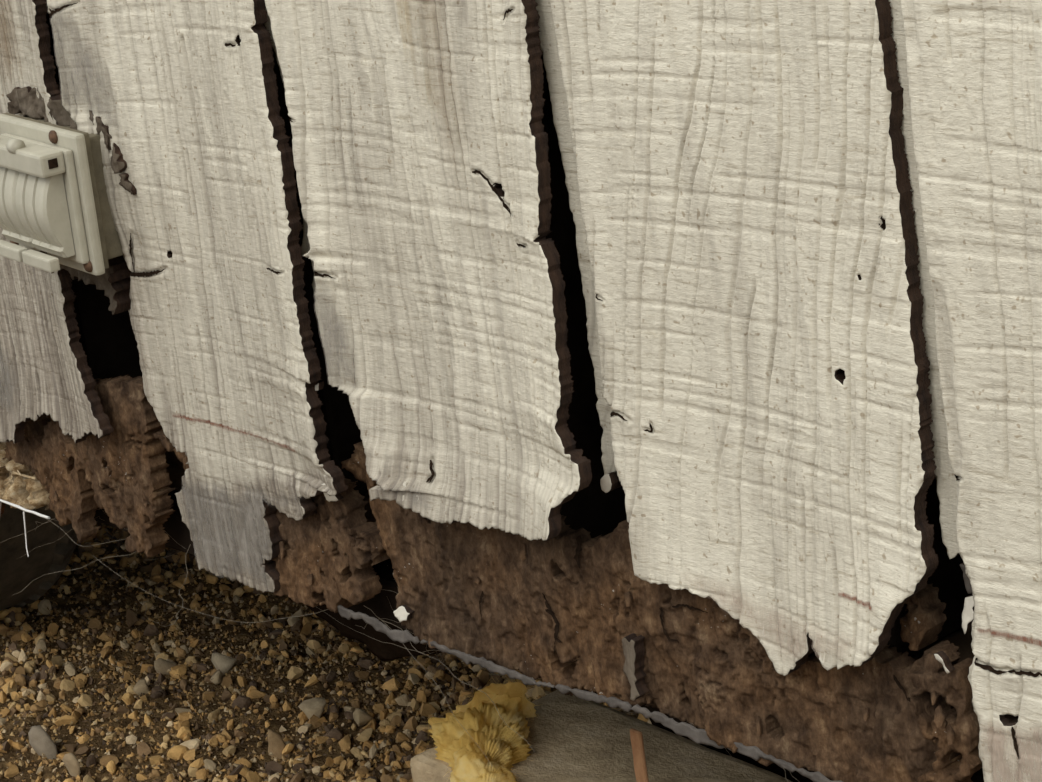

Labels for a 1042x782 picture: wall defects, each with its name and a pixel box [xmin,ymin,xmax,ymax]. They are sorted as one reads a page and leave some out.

crack [49,2,78,19]
crack [472,170,511,217]
peeling [321,483,344,502]
peeling [960,562,974,634]
peeling [393,605,415,622]
peeling [934,651,955,674]
peeling [931,691,948,730]